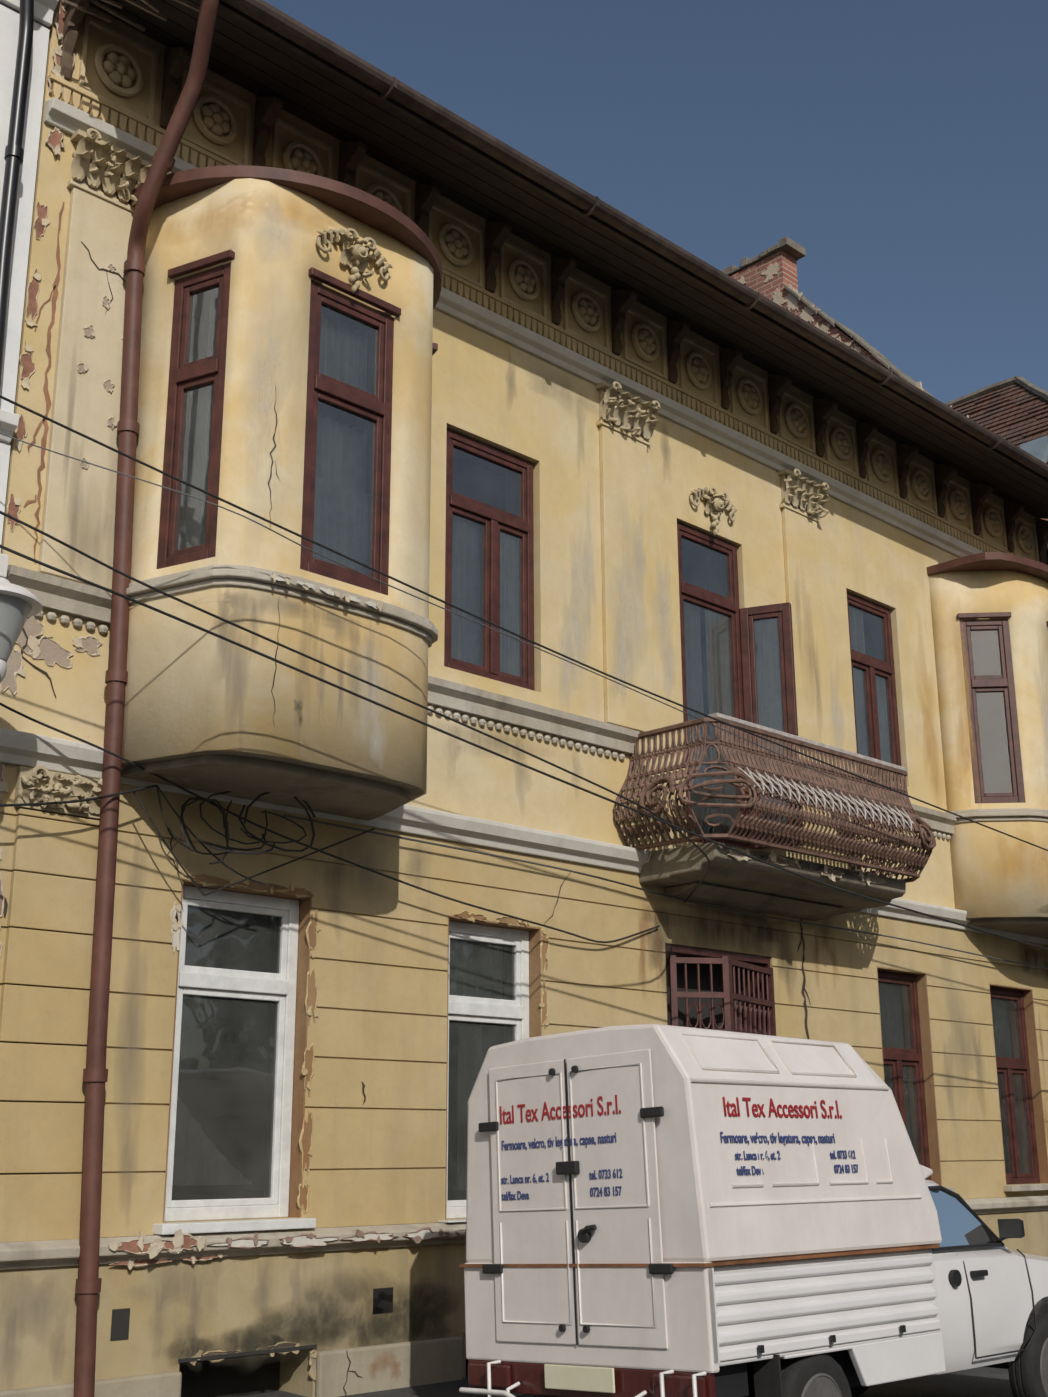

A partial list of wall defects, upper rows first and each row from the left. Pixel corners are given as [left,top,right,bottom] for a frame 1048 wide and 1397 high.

peeling [33,202,50,241]
peeling [19,268,42,390]
peeling [737,262,865,355]
crack [24,202,126,564]
peeling [14,413,28,452]
crack [268,385,279,528]
peeling [6,493,21,532]
peeling [170,902,183,954]
peeling [183,873,320,1026]
peeling [297,1043,314,1215]
peeling [108,1227,466,1270]